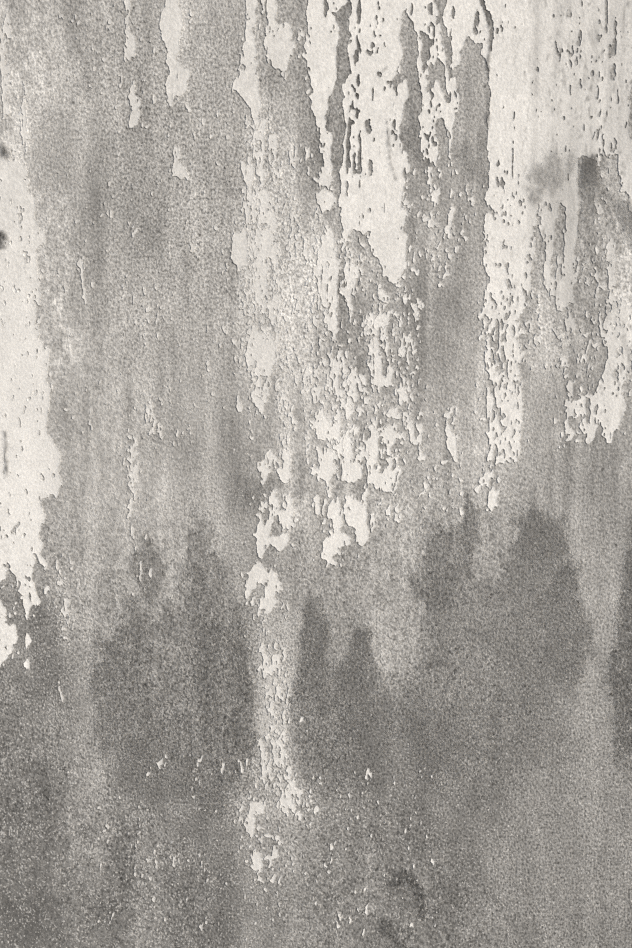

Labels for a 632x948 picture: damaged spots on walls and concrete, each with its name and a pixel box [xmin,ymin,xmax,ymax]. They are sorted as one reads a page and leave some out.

peeling [166,117,199,180]
peeling [0,14,74,669]
peeling [77,256,104,304]
peeling [122,274,182,345]
peeling [211,0,632,927]
damp [94,528,259,779]
damp [291,603,390,777]
damp [408,502,591,738]
damp [612,555,632,768]
peeling [134,841,208,935]